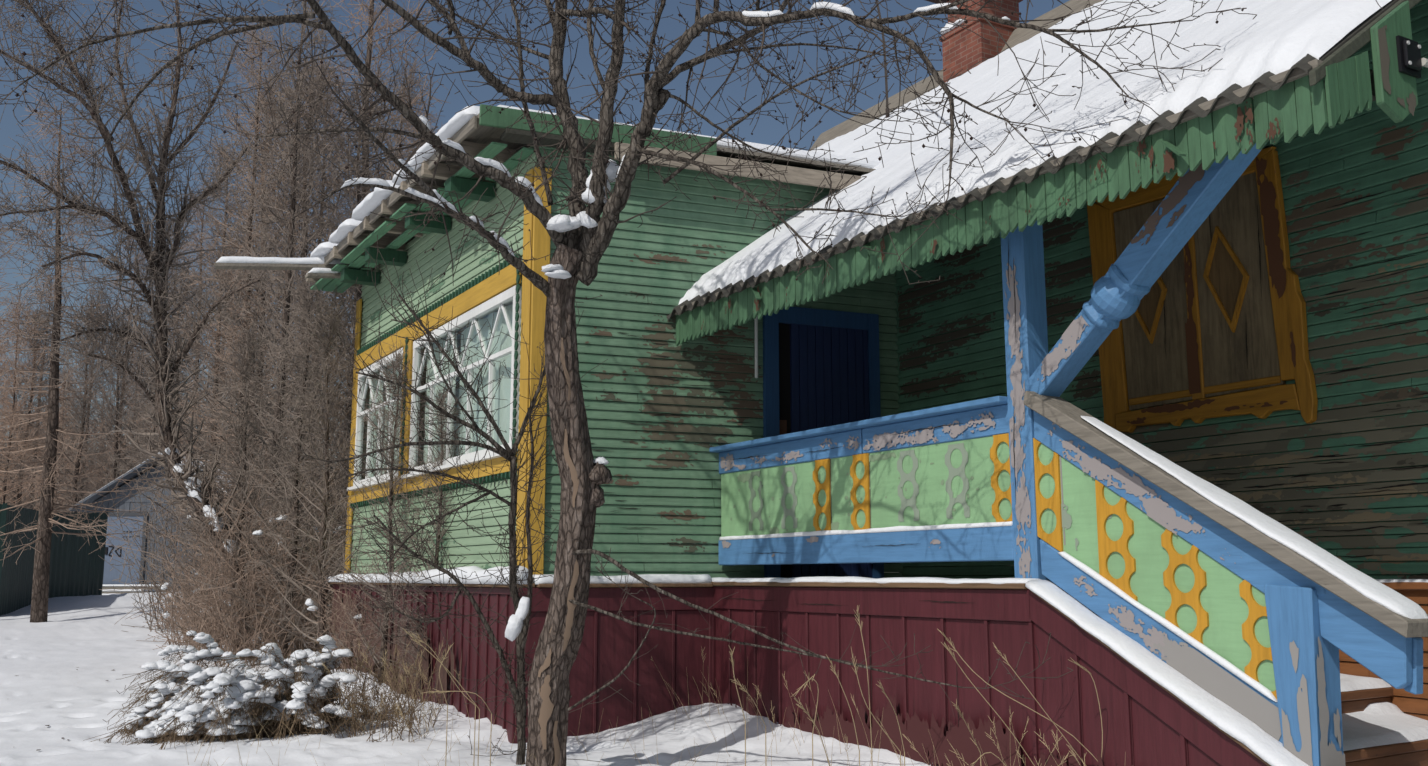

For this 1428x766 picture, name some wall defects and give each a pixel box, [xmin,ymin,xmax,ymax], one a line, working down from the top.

peeling [1371,25,1428,161]
peeling [930,215,991,269]
peeling [591,286,787,488]
peeling [899,345,986,398]
peeling [1005,196,1092,578]
peeling [654,509,718,554]